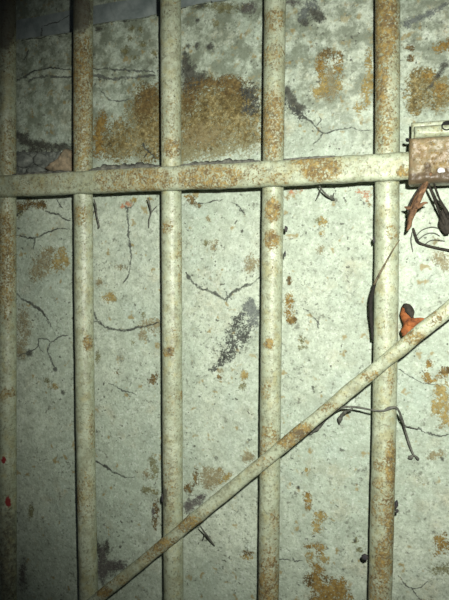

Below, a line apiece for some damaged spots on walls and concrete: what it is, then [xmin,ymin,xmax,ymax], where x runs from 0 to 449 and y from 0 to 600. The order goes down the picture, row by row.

corrosion [313,47,343,100]
corrosion [403,46,449,116]
corrosion [93,80,161,164]
corrosion [181,74,263,164]
crack [295,105,369,144]
crack [123,206,132,283]
crack [19,299,69,372]
crack [94,312,159,332]
crack [185,272,261,302]
mould [208,297,260,372]
corrosion [422,359,449,429]
corrosion [303,543,354,600]